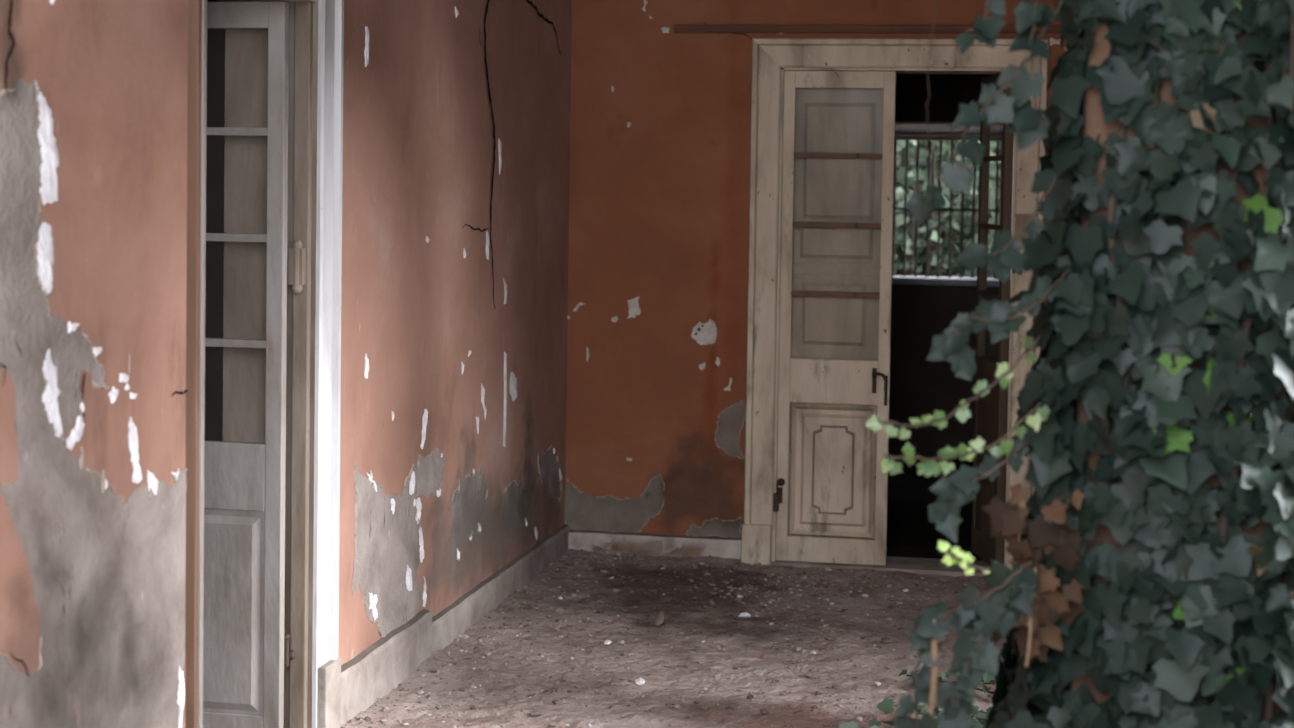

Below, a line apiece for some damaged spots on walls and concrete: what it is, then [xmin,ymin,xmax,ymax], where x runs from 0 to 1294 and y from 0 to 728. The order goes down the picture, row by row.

crack [5,0,16,90]
crack [527,0,561,55]
crack [463,0,496,307]
flaking render [611,296,641,323]
peeling [0,78,188,728]
flaking render [476,384,487,434]
flaking render [503,352,517,447]
peeling [691,319,746,460]
peeling [351,409,488,638]
peeling [685,516,743,538]